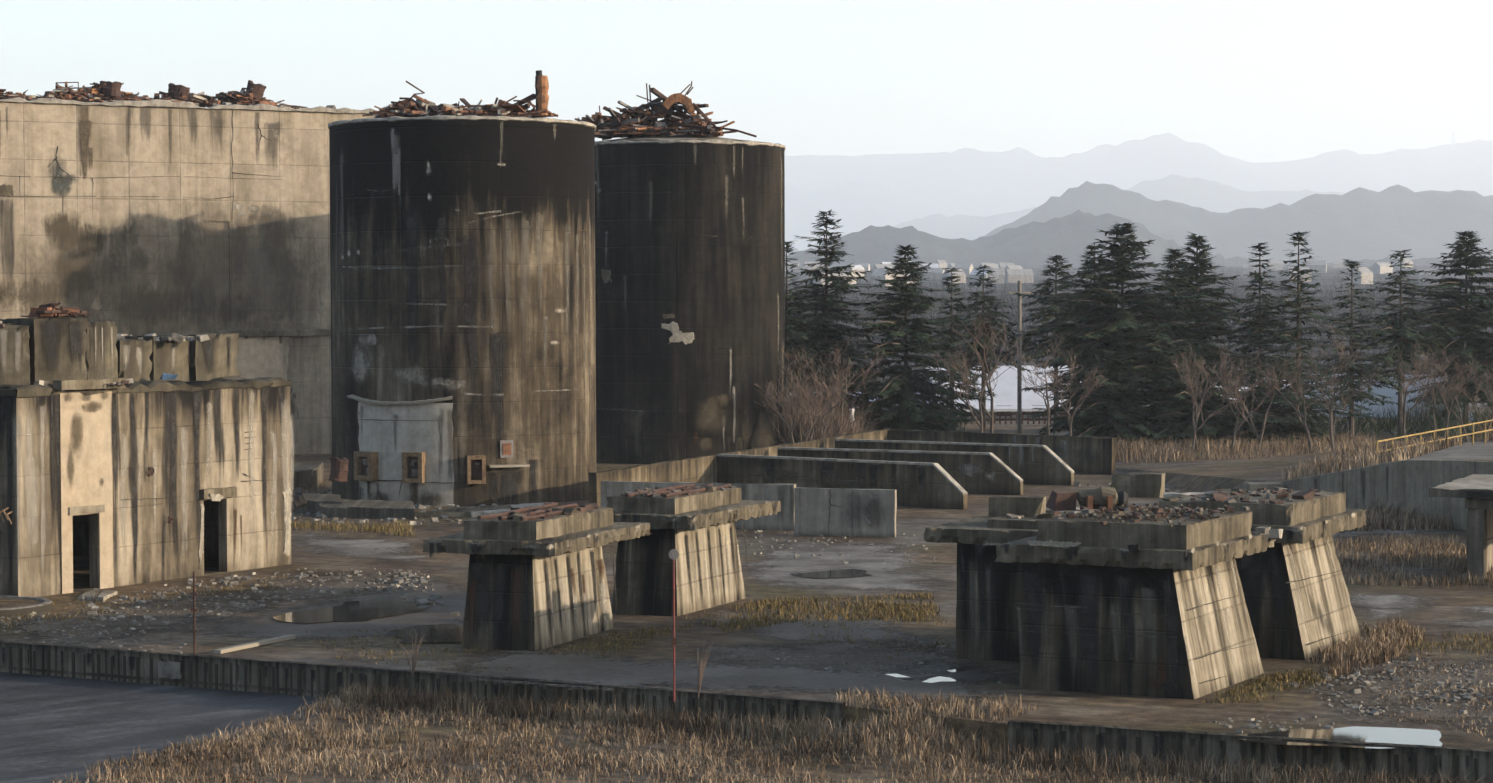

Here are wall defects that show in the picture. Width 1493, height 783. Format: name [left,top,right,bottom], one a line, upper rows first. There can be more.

leakage [52,106,93,195]
leakage [725,147,756,237]
leakage [42,321,83,371]
leakage [0,215,143,306]
leakage [119,232,282,369]
leakage [336,147,653,453]
spalling [661,313,695,345]
leakage [0,384,12,583]
leakage [50,388,240,577]
leakage [261,386,285,520]
leakage [411,493,441,506]
leakage [489,460,538,502]